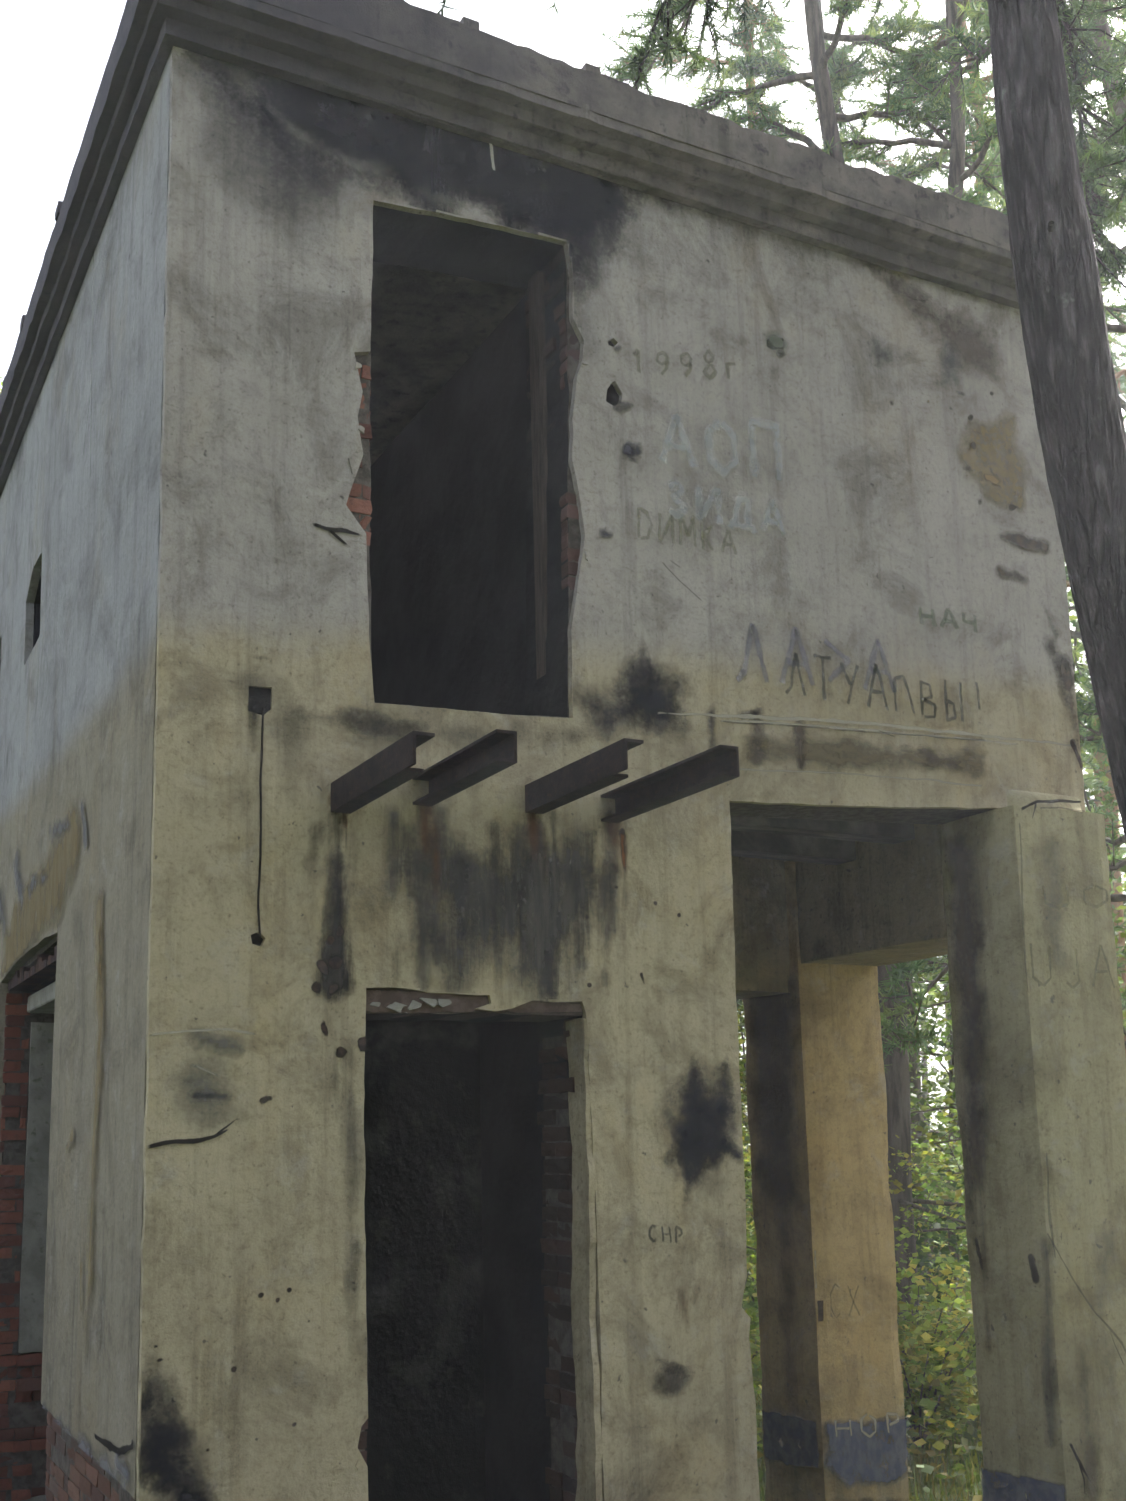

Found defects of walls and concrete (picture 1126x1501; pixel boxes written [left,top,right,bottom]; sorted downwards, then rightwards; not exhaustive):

damp [195,52,624,249]
flaking render [346,362,372,546]
crack [314,523,359,545]
damp [583,660,673,729]
damp [312,812,355,1001]
damp [390,810,617,996]
damp [321,1021,366,1057]
crack [148,1121,234,1148]
peeling [762,1410,910,1501]
peeling [981,1468,1065,1501]